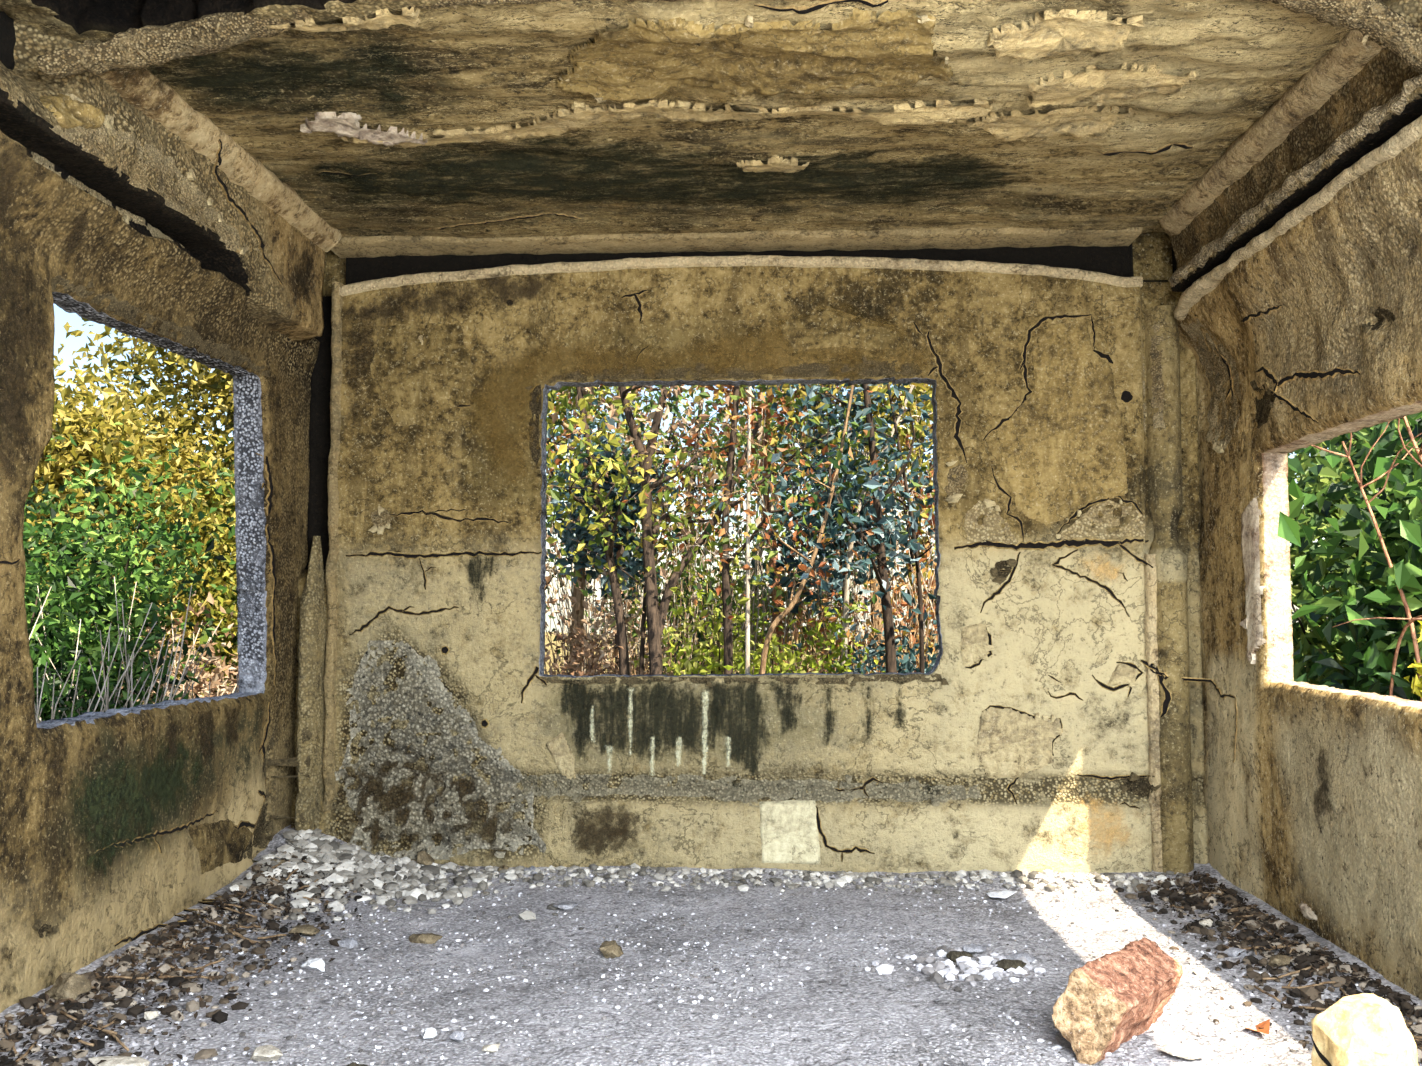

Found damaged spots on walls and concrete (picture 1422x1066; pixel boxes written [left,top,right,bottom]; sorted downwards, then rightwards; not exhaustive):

spalling [7,136,185,248]
leakage [125,40,427,115]
spalling [36,0,559,255]
leakage [311,135,1028,206]
flaking render [300,0,1196,148]
crack [913,314,1153,669]
crack [346,508,541,636]
leakage [561,681,802,792]
spalling [334,640,1063,865]
leakage [824,687,835,744]
crack [982,659,1238,809]
crack [816,777,884,862]